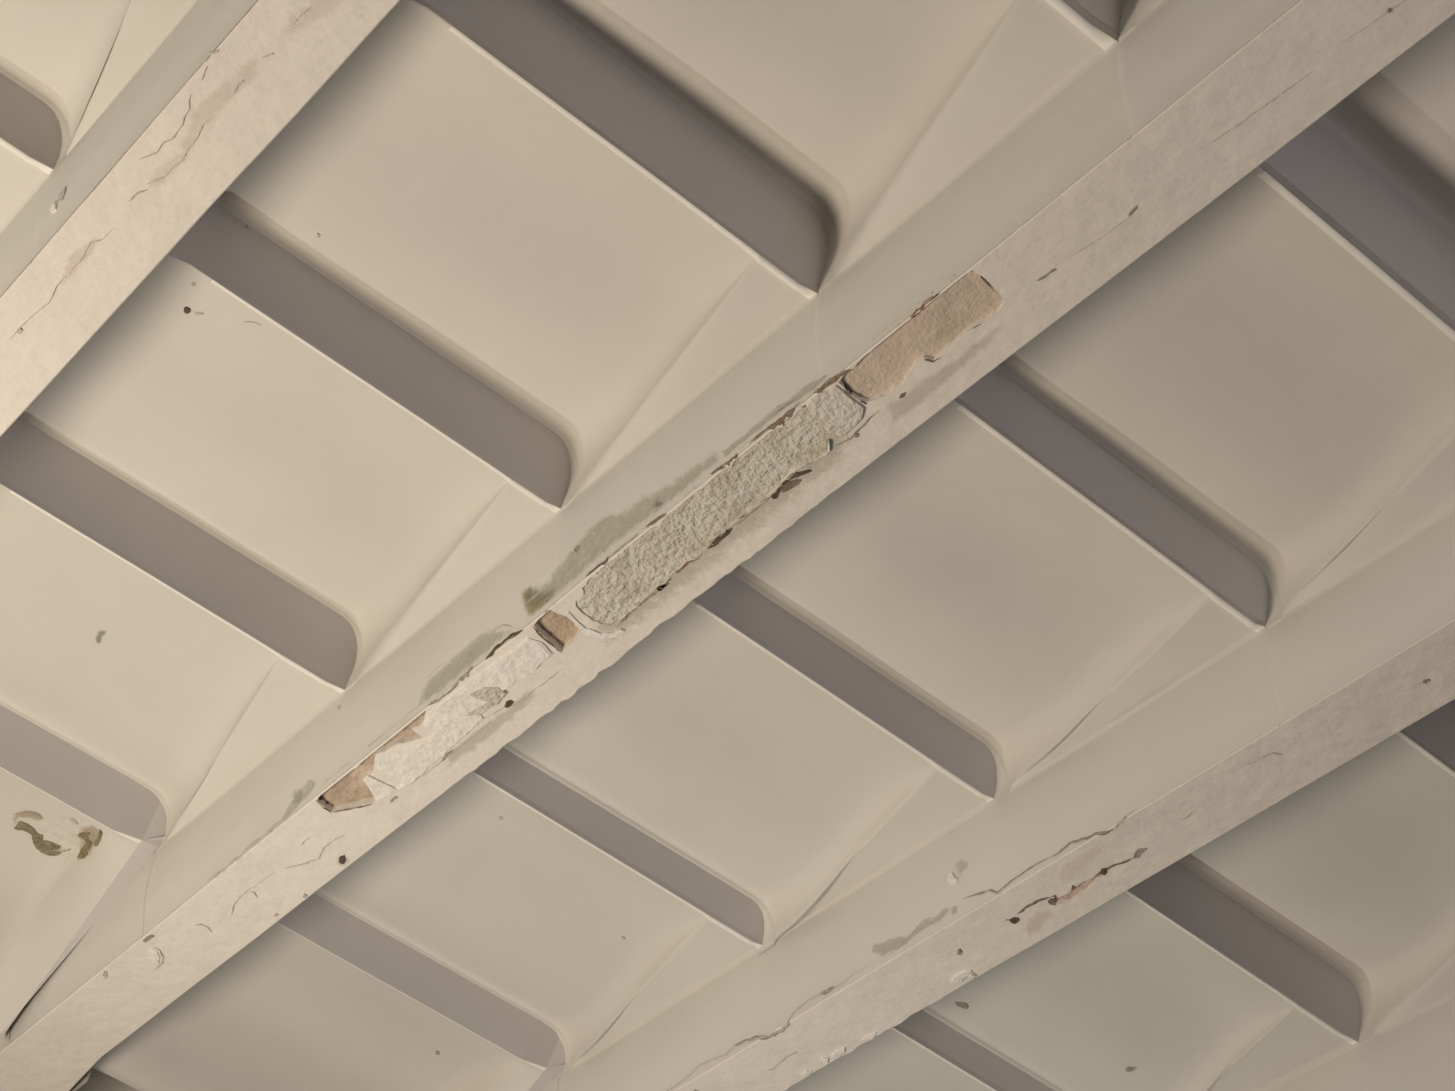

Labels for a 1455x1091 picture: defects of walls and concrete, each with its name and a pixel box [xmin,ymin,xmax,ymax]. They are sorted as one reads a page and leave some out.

peeling [316,271,1002,813]
crack [666,811,1147,1091]